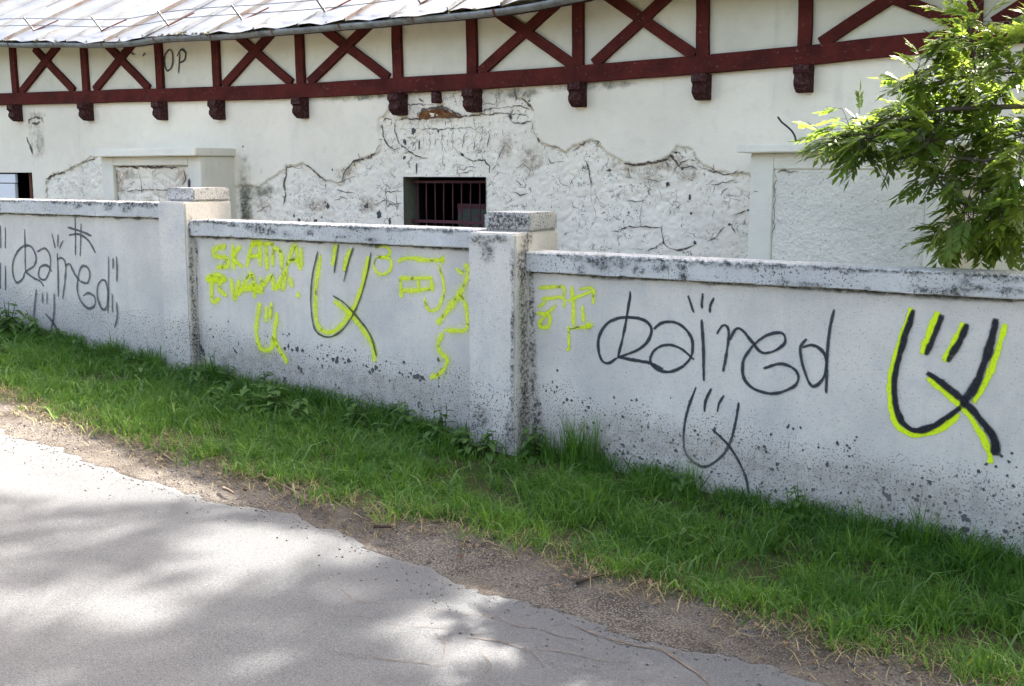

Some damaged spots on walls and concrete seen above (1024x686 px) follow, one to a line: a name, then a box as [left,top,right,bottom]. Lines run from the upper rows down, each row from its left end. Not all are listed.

flaking render [46,157,104,200]
flaking render [236,87,750,259]
crack [240,90,797,253]
damp [189,178,1024,450]